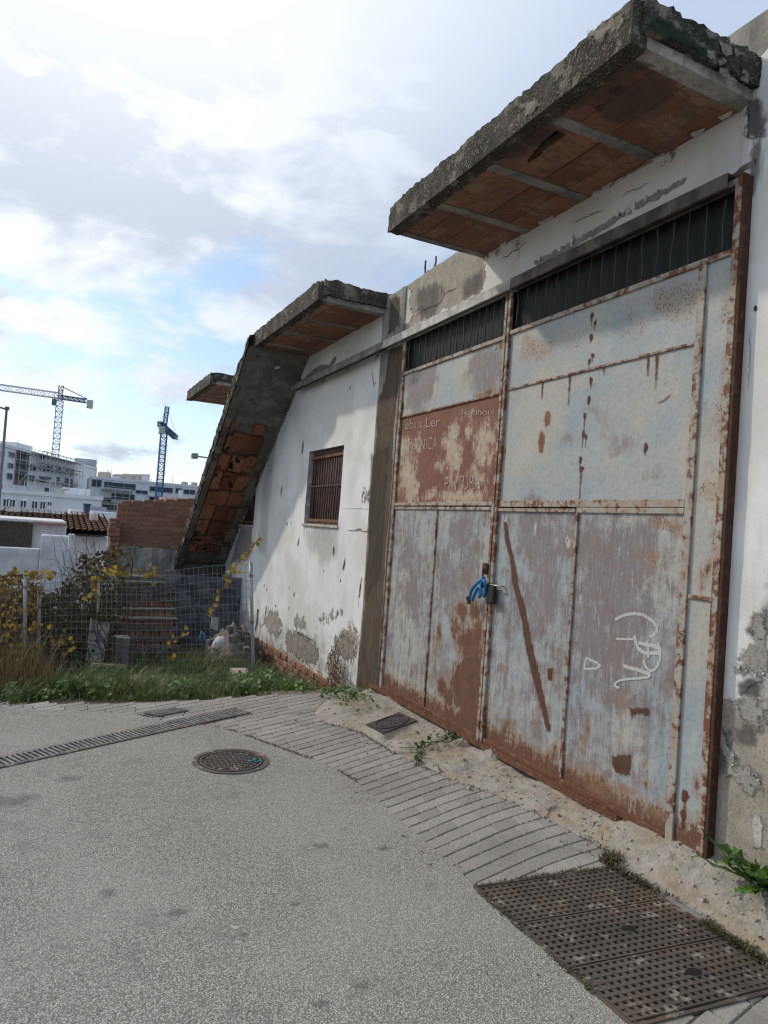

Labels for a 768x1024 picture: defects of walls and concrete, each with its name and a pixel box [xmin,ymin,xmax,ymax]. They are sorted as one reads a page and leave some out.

peeling [534,178,686,265]
corrosion [579,312,604,500]
peeling [263,604,358,688]
corrosion [503,522,553,732]
peeling [731,608,768,683]
corrosion [630,707,649,716]
corrosion [612,754,631,776]
corrosion [680,790,689,837]